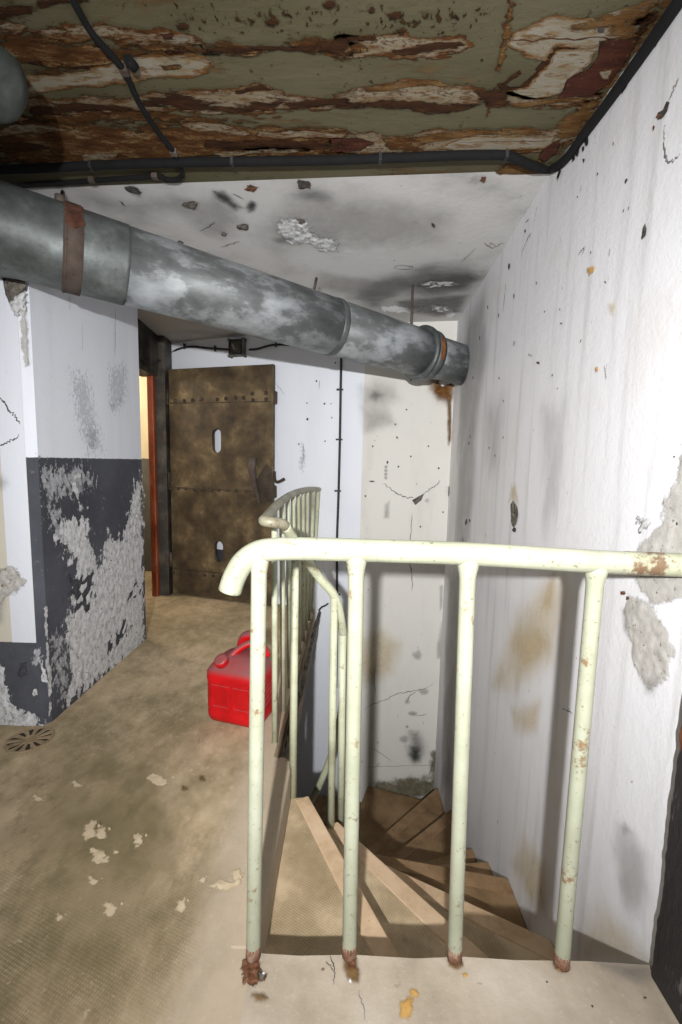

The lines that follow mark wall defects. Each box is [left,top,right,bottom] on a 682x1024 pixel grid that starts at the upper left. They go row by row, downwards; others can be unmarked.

peeling [0,0,659,162]
peeling [276,217,339,253]
spalling [2,277,28,366]
leakage [379,305,417,314]
corrosion [431,379,453,444]
crack [370,481,440,540]
flaking render [636,455,682,553]
peeling [0,456,147,751]
flaking render [621,575,682,690]
crack [364,666,431,716]